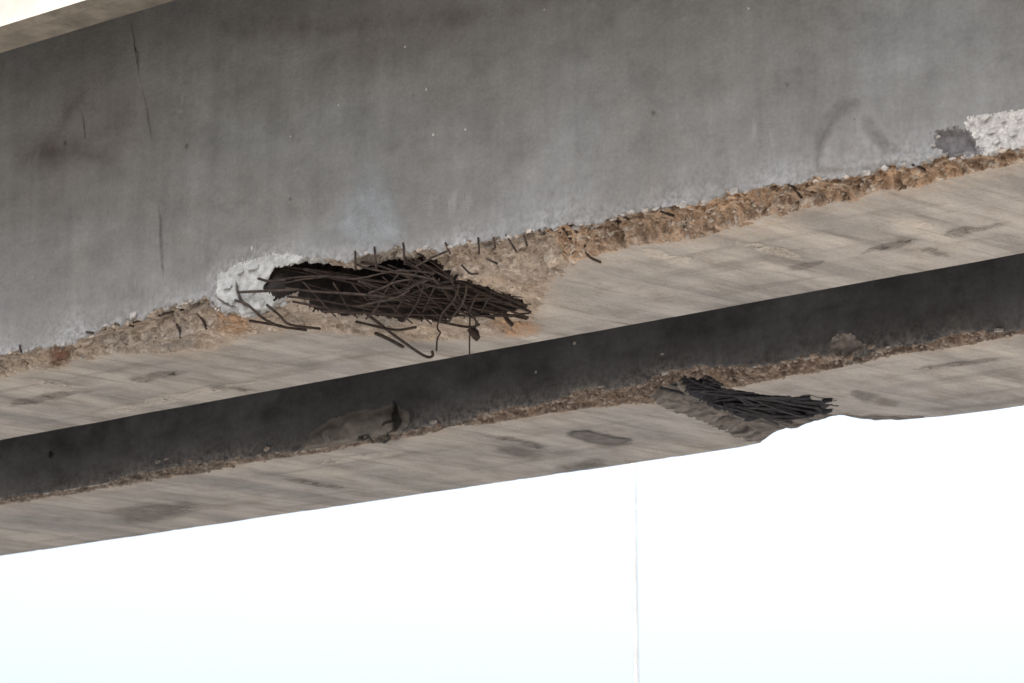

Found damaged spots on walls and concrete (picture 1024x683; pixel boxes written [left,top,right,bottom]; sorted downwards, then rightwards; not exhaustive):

spalling [0,109,1024,378]
spalling [0,328,1024,505]